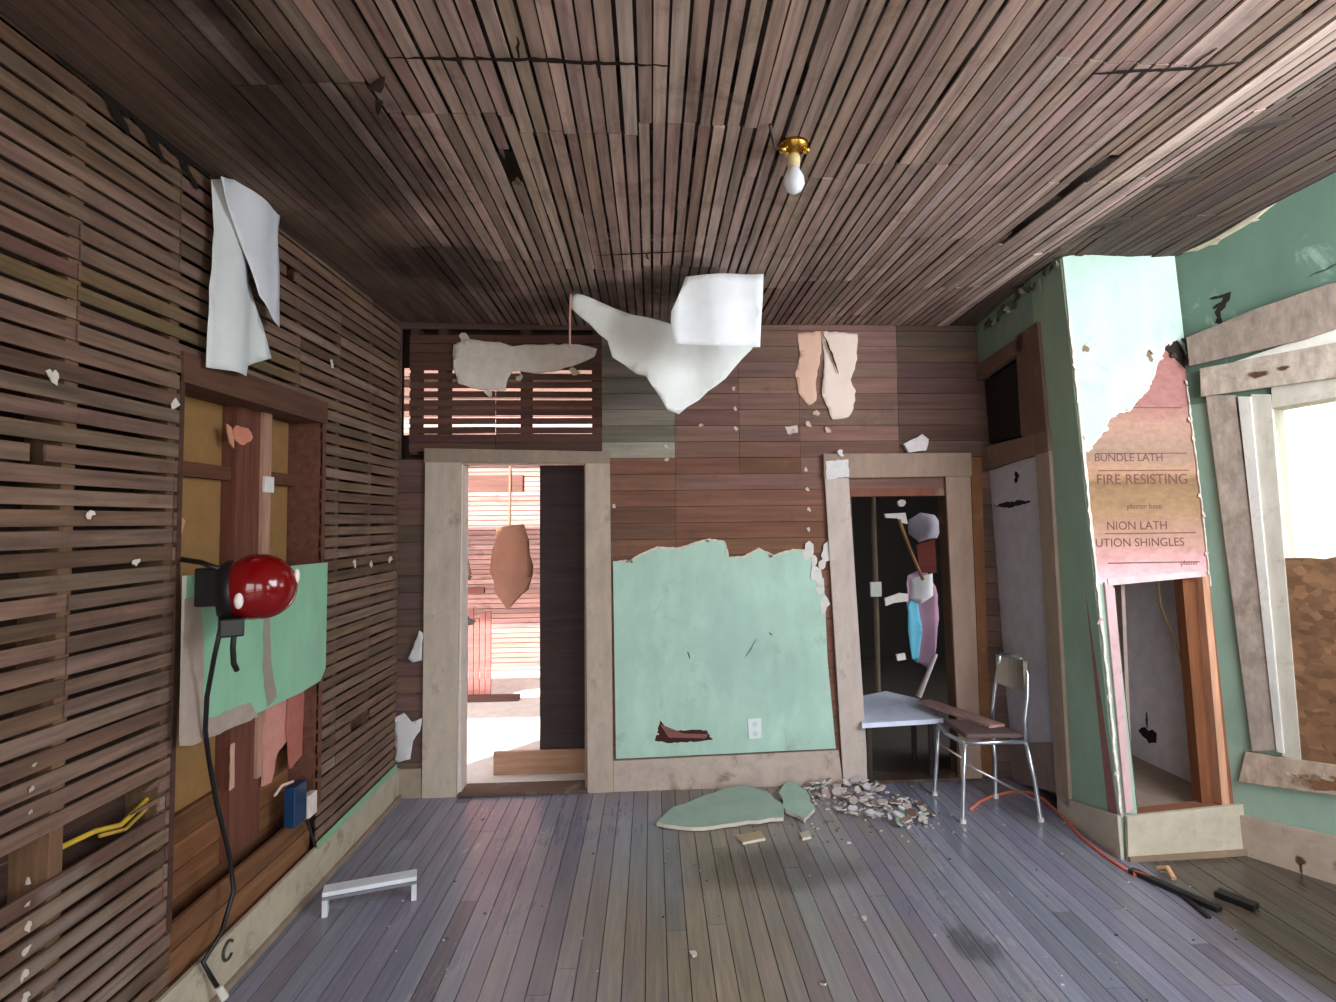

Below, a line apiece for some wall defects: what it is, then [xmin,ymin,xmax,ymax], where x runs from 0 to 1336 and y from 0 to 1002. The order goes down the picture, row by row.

flaking render [453,333,597,397]
peeling [789,331,831,435]
flaking render [1146,336,1211,586]
peeling [618,538,830,614]
peeling [1286,772,1336,791]